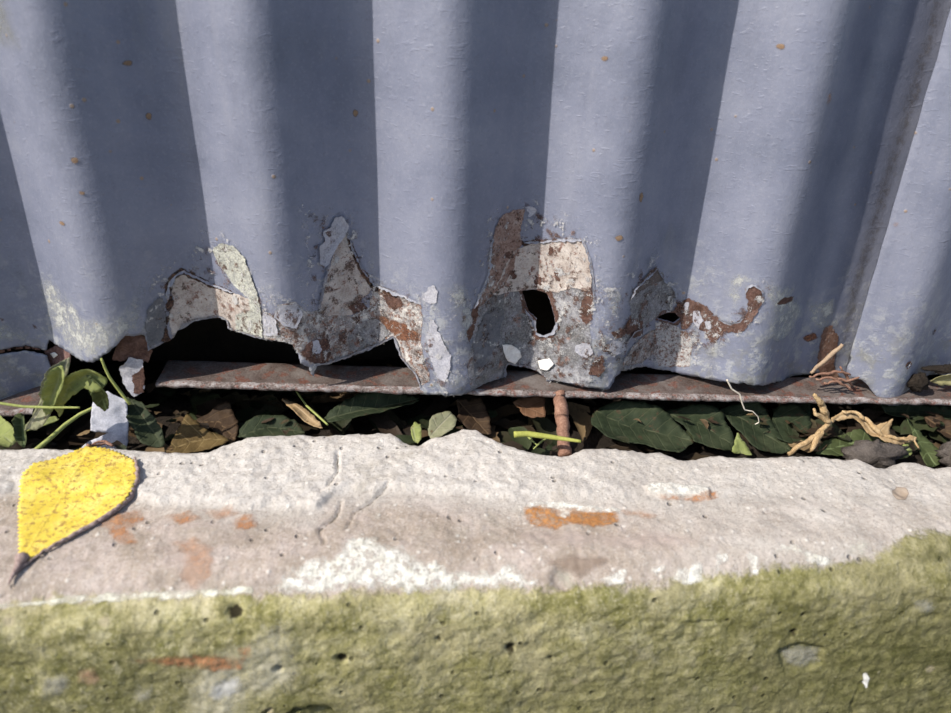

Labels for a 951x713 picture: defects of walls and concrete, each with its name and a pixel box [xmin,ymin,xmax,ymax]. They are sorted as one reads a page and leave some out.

leakage [46,284,107,350]
peeling [301,210,438,326]
peeling [426,319,451,382]
peeling [473,200,608,376]
corrosion [463,255,768,387]
peeling [653,322,693,367]
corrosion [525,501,620,529]
efflorescence [281,538,535,593]